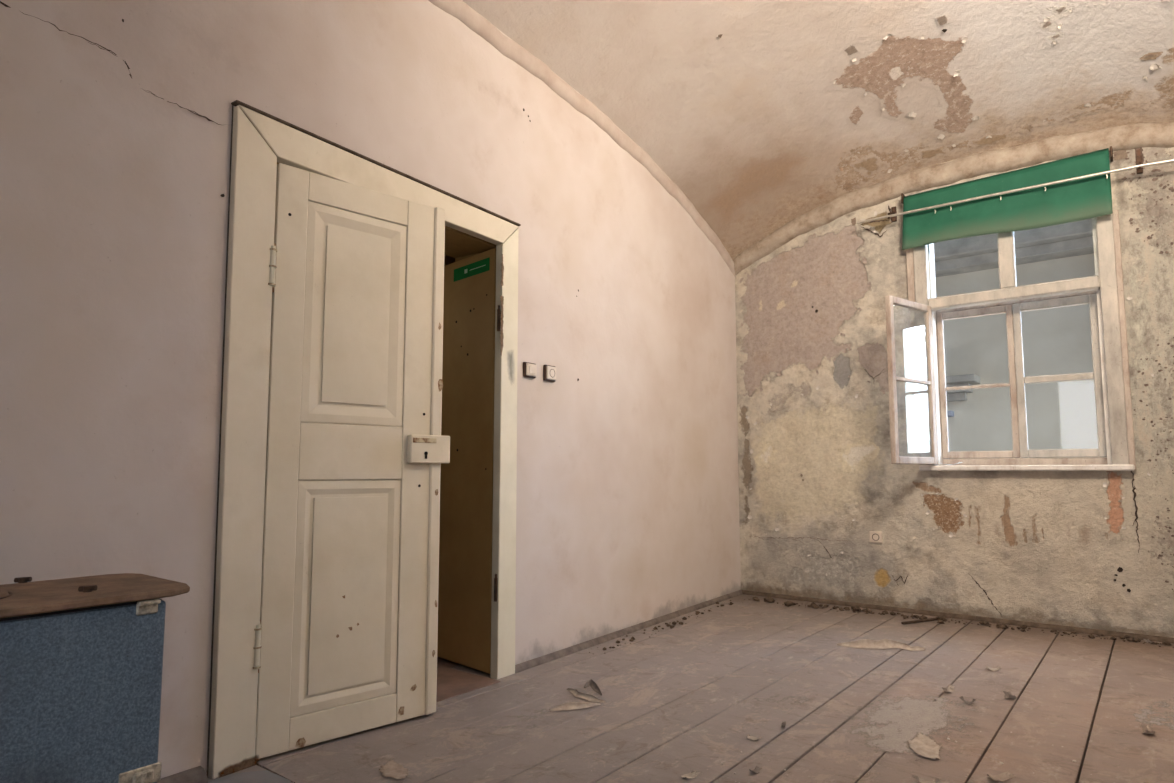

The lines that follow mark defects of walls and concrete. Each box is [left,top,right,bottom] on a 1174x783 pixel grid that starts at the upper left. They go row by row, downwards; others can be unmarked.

crack [0,1,221,125]
flaking render [825,29,1174,193]
water stain [1110,147,1174,257]
flaking render [735,206,894,591]
flaking render [910,479,1047,566]
water stain [1134,327,1174,599]
water stain [743,566,1174,638]